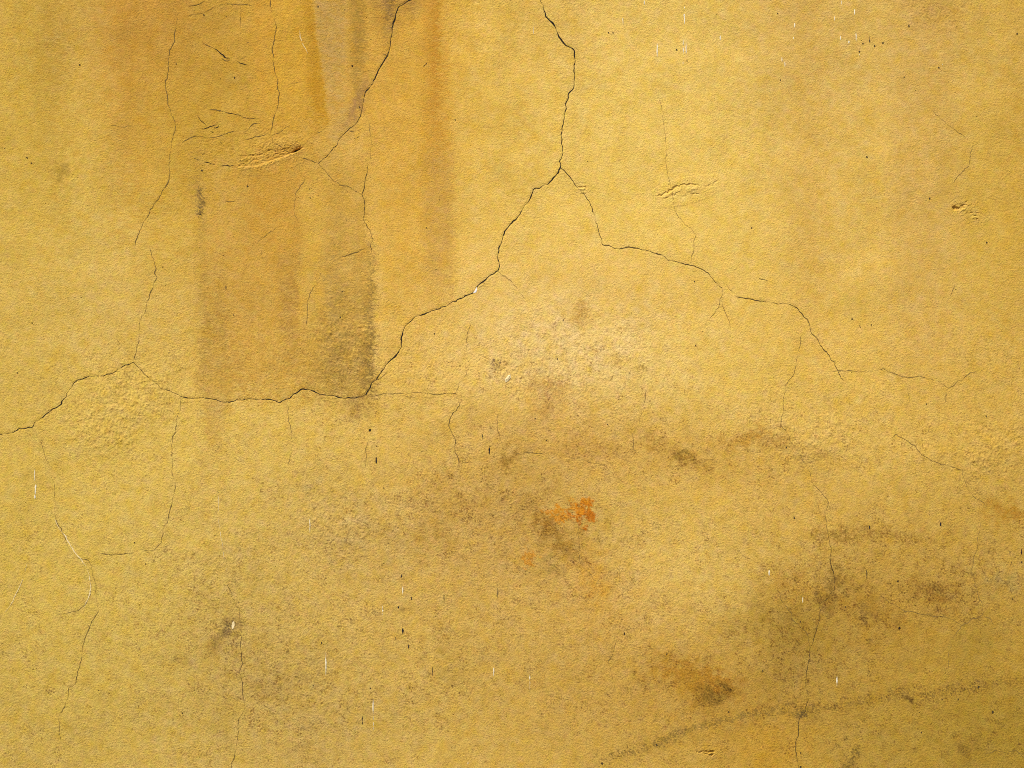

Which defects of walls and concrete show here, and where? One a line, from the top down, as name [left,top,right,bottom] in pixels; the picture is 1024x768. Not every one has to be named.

water stain [175,0,388,532]
crack [0,0,731,581]
water stain [632,422,731,483]
water stain [408,604,500,707]
water stain [508,480,584,592]
corrosion [534,492,624,643]
water stain [711,542,1024,712]